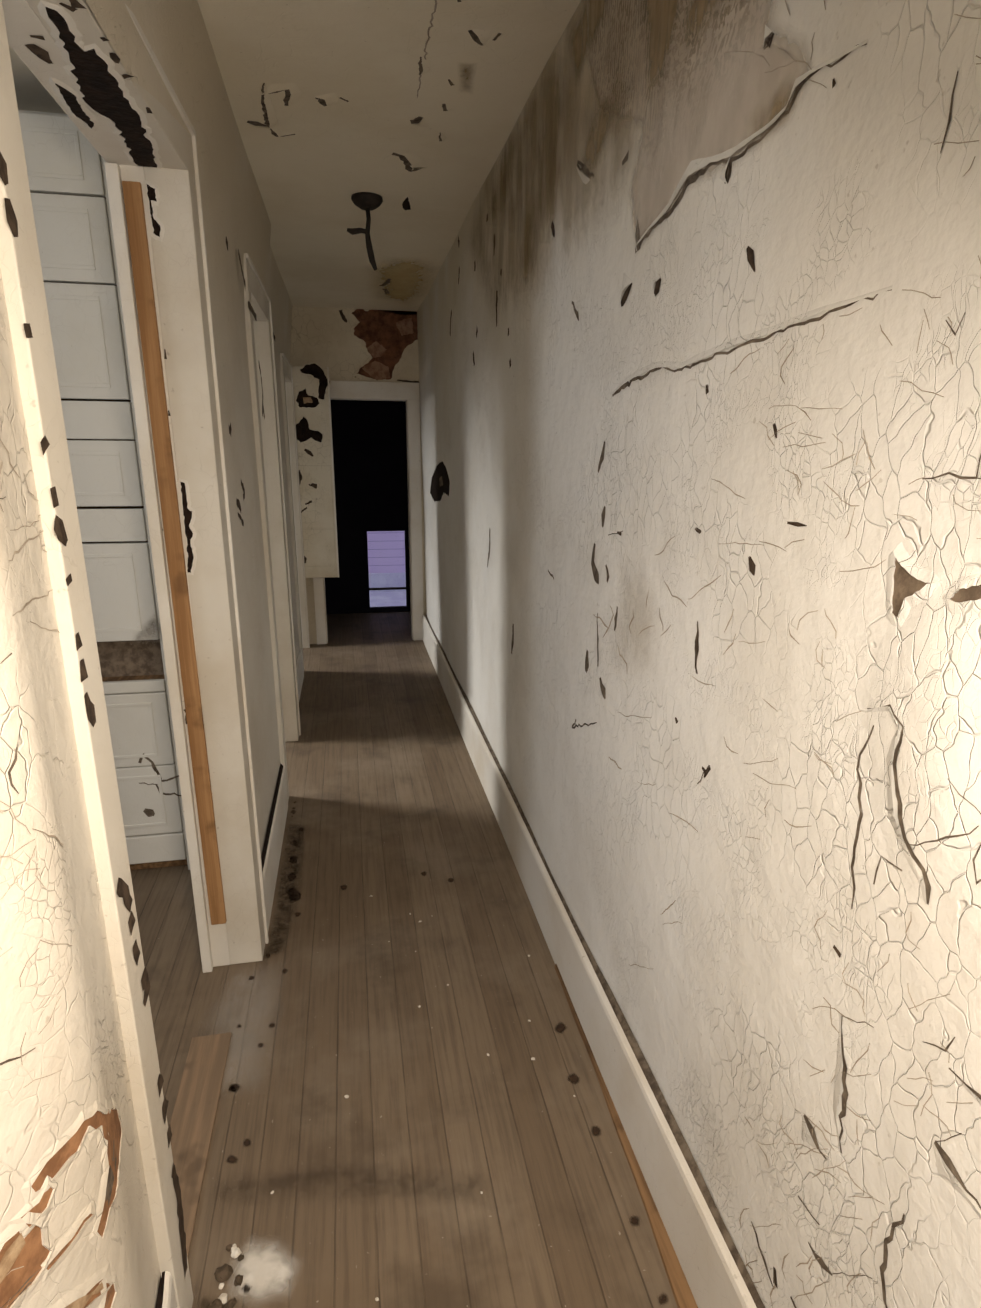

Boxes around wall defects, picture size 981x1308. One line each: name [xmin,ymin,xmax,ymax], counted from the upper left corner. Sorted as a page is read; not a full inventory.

spalling [25,0,165,242]
leakage [573,0,805,238]
crack [934,55,981,177]
peeling [295,362,331,457]
spalling [430,459,450,503]
crack [612,285,966,538]
crack [909,454,981,539]
peeling [76,632,96,728]
crack [585,506,836,718]
crack [0,747,63,900]
crack [739,704,981,1308]
peeling [0,1098,122,1308]